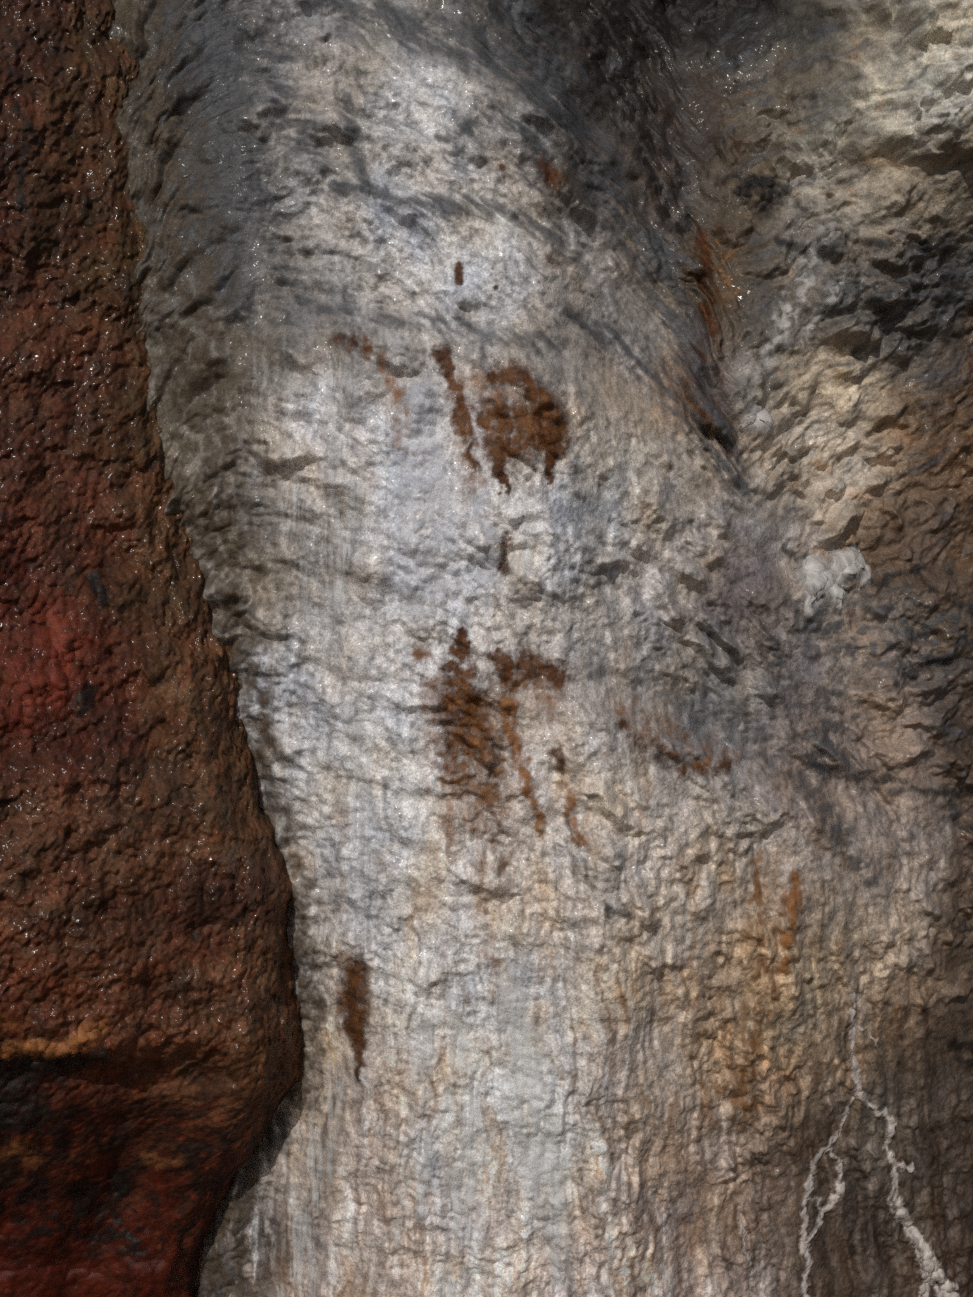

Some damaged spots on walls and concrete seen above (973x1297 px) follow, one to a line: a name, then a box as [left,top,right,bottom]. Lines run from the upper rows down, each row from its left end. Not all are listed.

corrosion [429,347,570,494]
corrosion [499,532,513,575]
corrosion [424,626,571,837]
corrosion [565,789,585,846]
corrosion [339,957,368,1081]